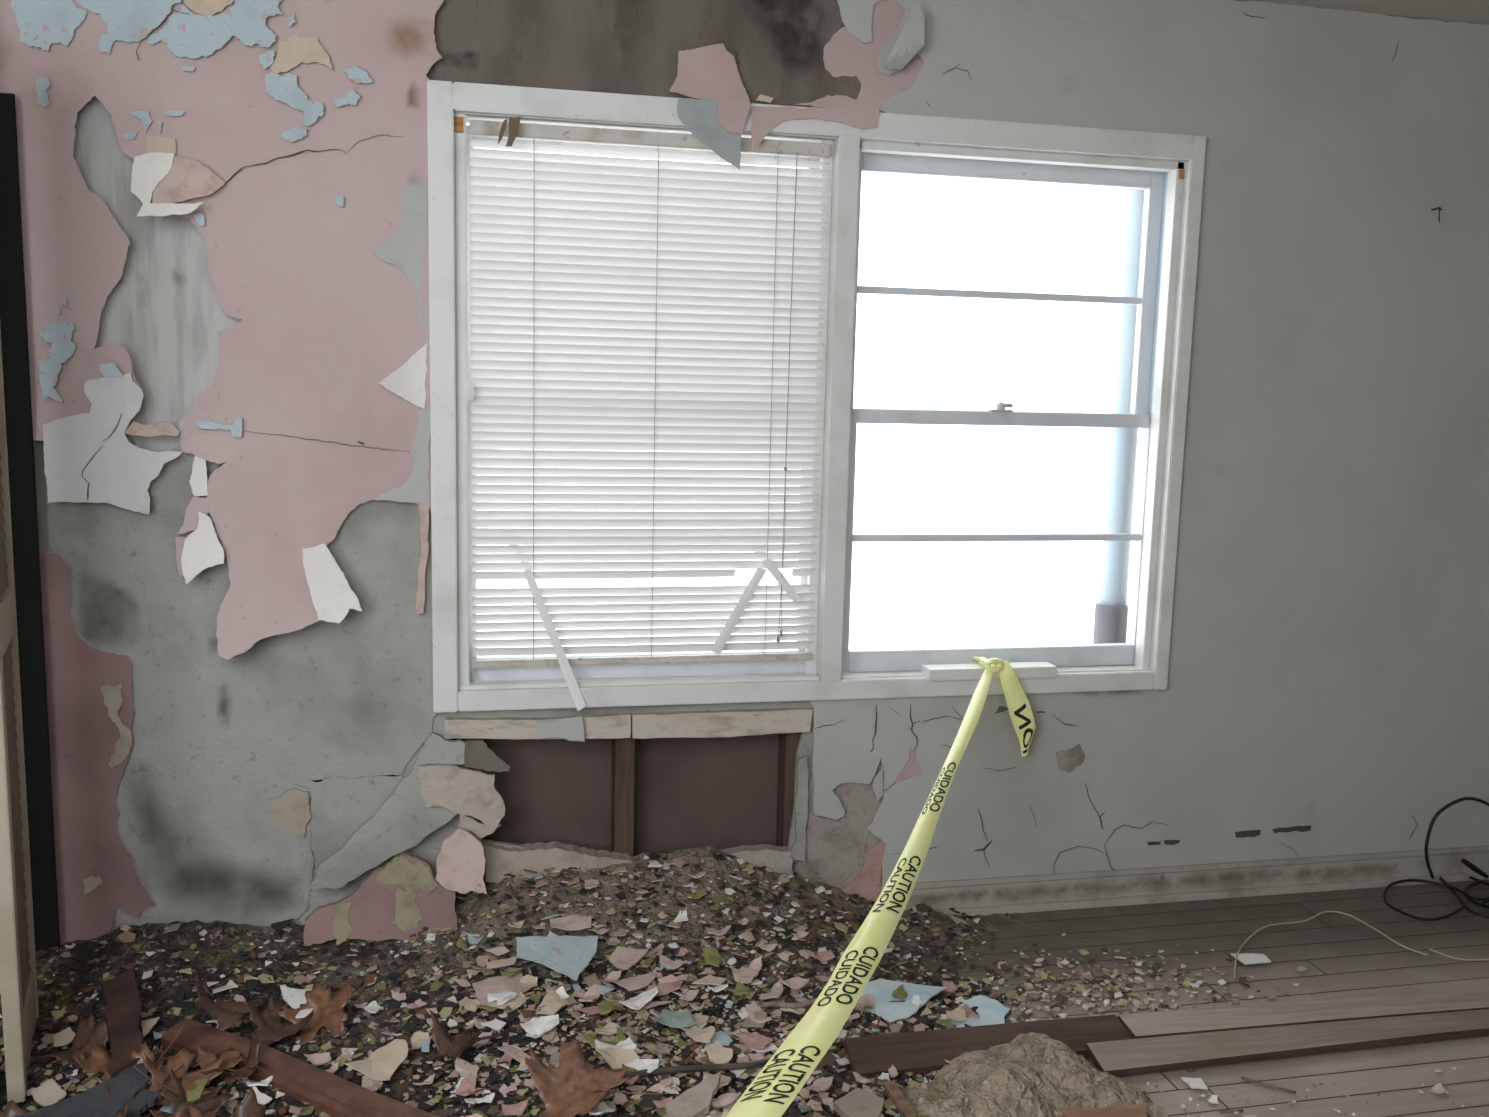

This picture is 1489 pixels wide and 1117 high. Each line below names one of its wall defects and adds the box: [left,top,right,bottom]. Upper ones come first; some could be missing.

peeling [10,0,373,142]
spalling [426,0,925,170]
crack [224,135,401,185]
peeling [37,297,76,403]
crack [247,431,410,452]
spalling [46,96,437,927]
crack [814,704,964,752]
spalling [790,749,923,902]
crack [974,809,992,865]
crack [1053,783,1169,871]